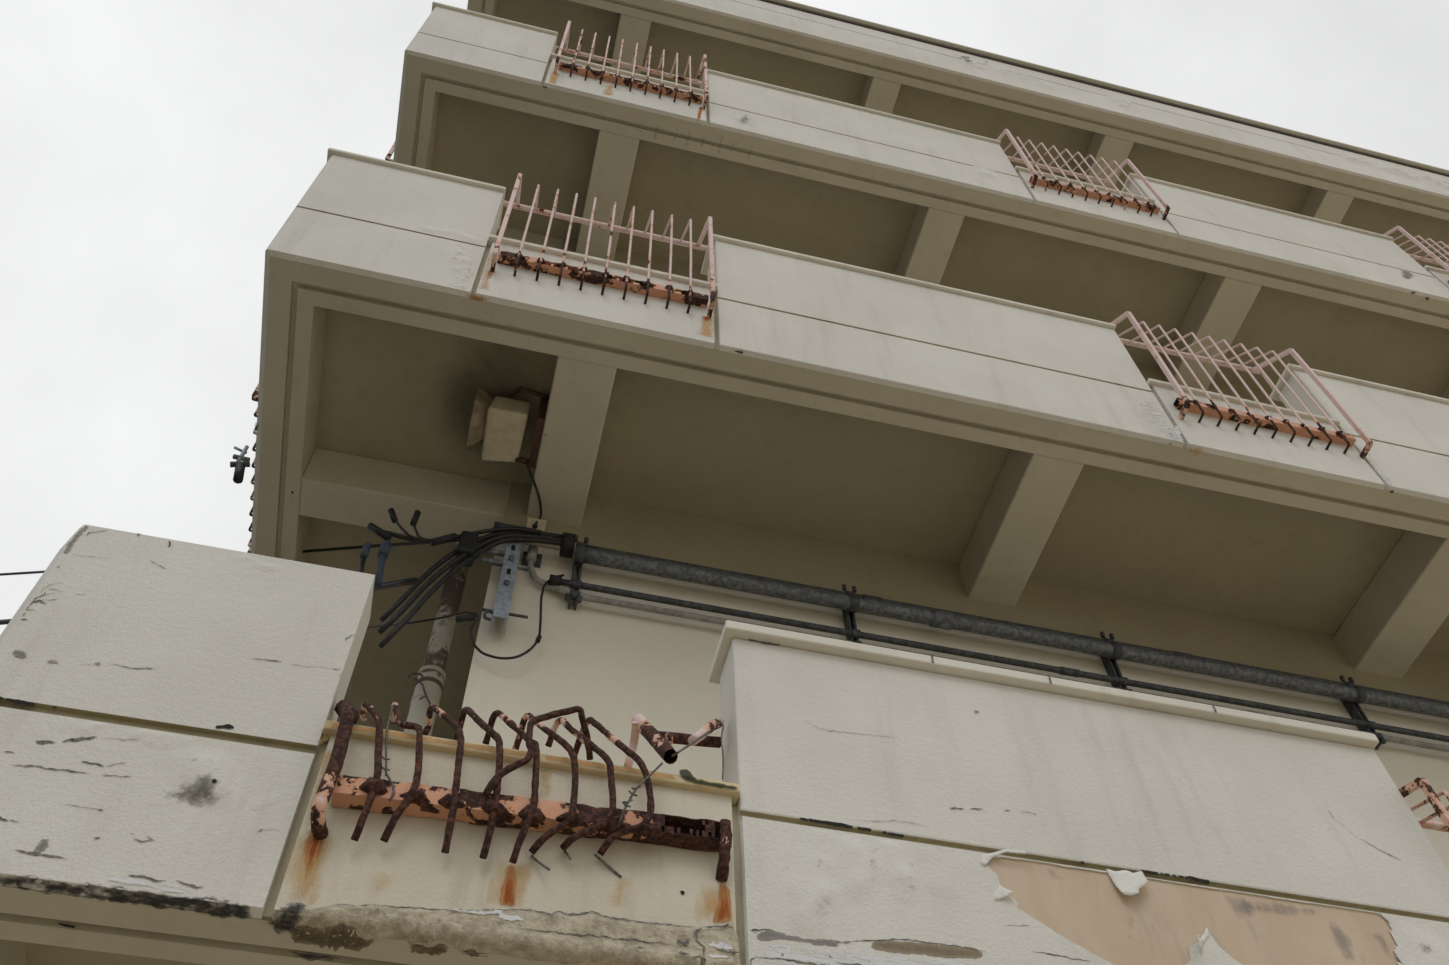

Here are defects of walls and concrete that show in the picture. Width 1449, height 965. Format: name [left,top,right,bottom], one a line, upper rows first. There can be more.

peeling [33,839,49,852]
rust [295,831,325,892]
peeling [109,877,191,892]
rust [498,865,526,906]
rust [705,884,731,922]
peeling [979,849,1403,965]
spalling [274,905,741,965]
peeling [757,930,983,965]